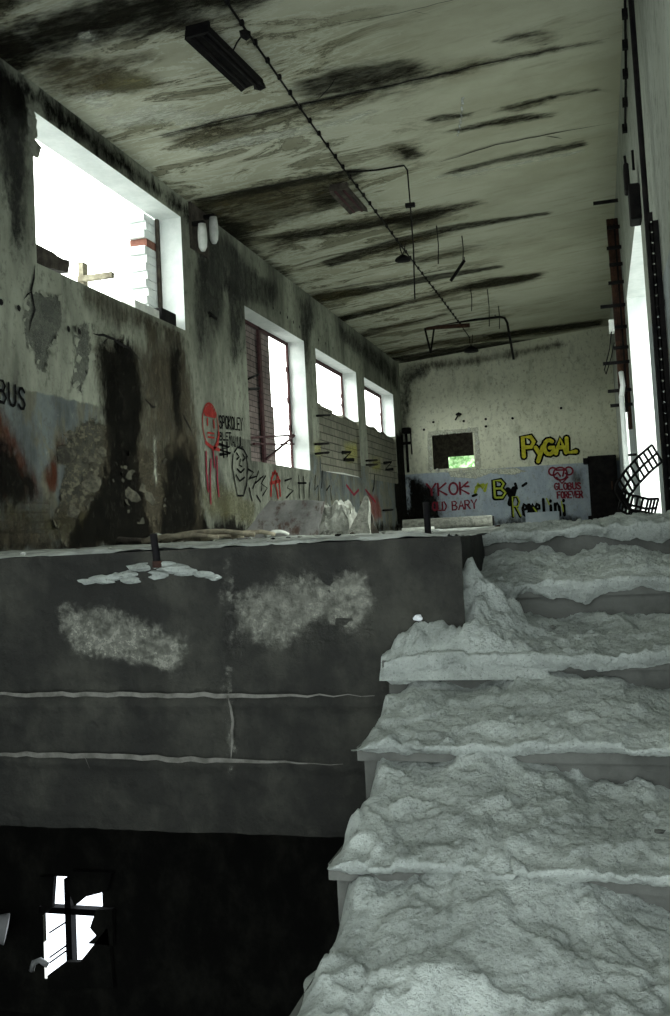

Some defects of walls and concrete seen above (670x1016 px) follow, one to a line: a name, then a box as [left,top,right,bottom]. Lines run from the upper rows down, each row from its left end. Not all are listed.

leakage [498,32,563,62]
leakage [0,0,549,363]
leakage [427,92,578,136]
leakage [448,142,585,176]
peeling [23,289,96,393]
leakage [0,291,245,551]
leakage [300,266,603,531]